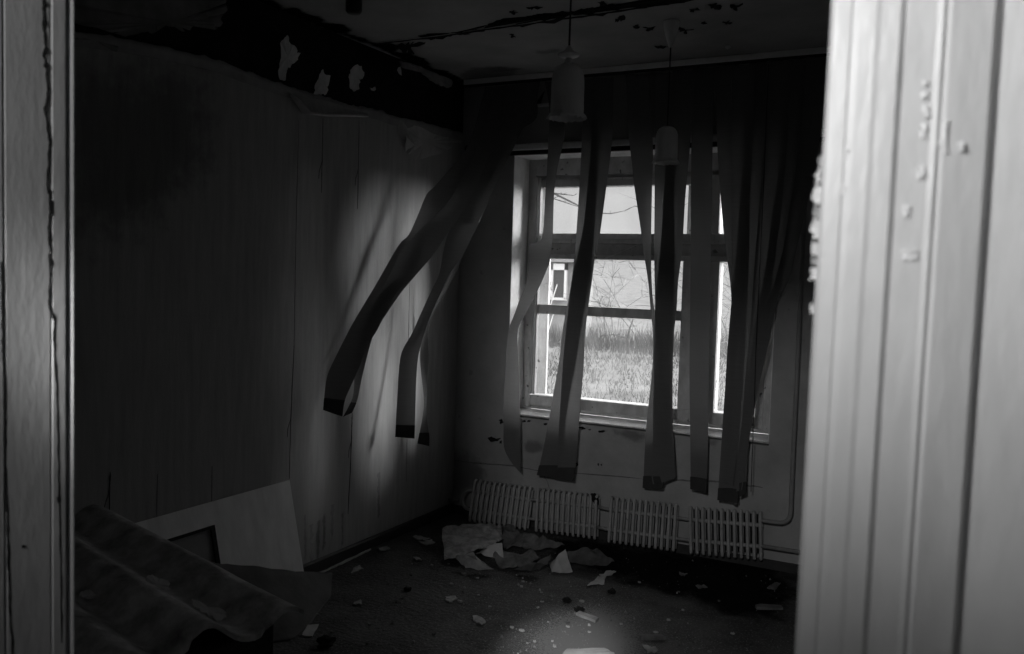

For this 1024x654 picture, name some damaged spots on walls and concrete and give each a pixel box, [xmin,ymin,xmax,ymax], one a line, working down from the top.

crack [42,0,63,643]
peeling [75,32,464,141]